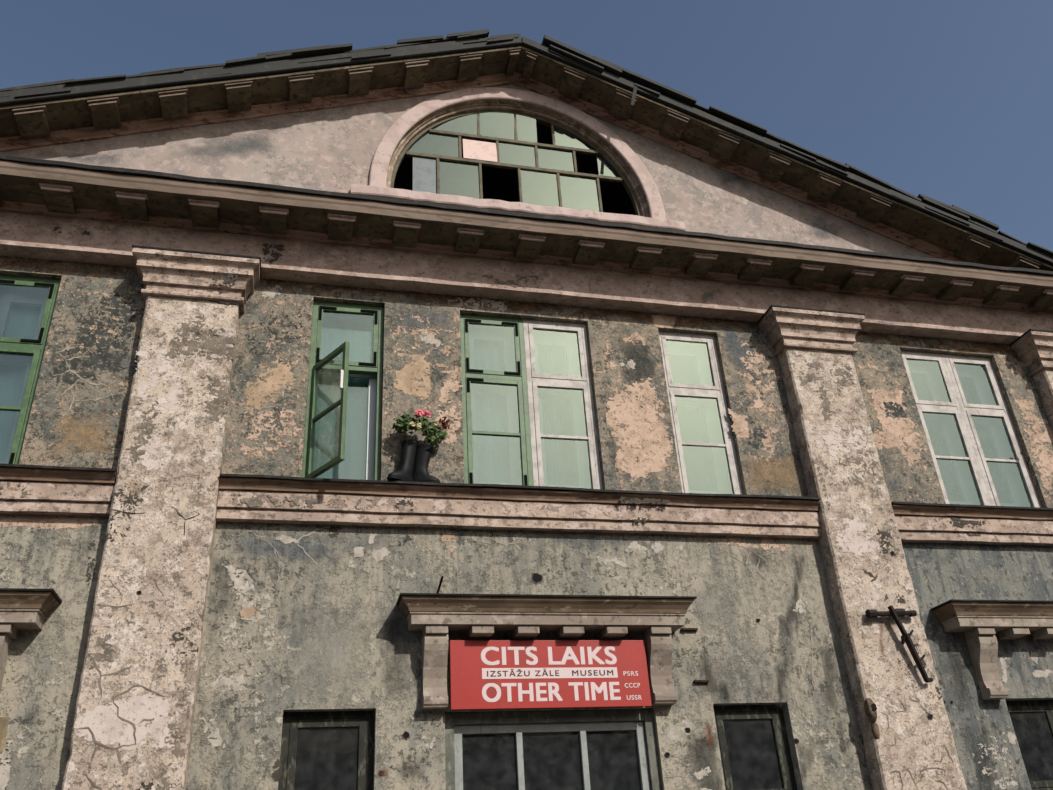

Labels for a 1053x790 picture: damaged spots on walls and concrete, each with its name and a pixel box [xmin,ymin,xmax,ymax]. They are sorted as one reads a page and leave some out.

spalling [262,285,282,299]
peeling [0,292,304,588]
peeling [390,313,463,449]
peeling [602,332,673,481]
peeling [797,358,922,557]
peeling [1014,396,1053,490]
spalling [0,740,13,790]
crack [72,653,165,790]
spalling [970,732,1018,789]